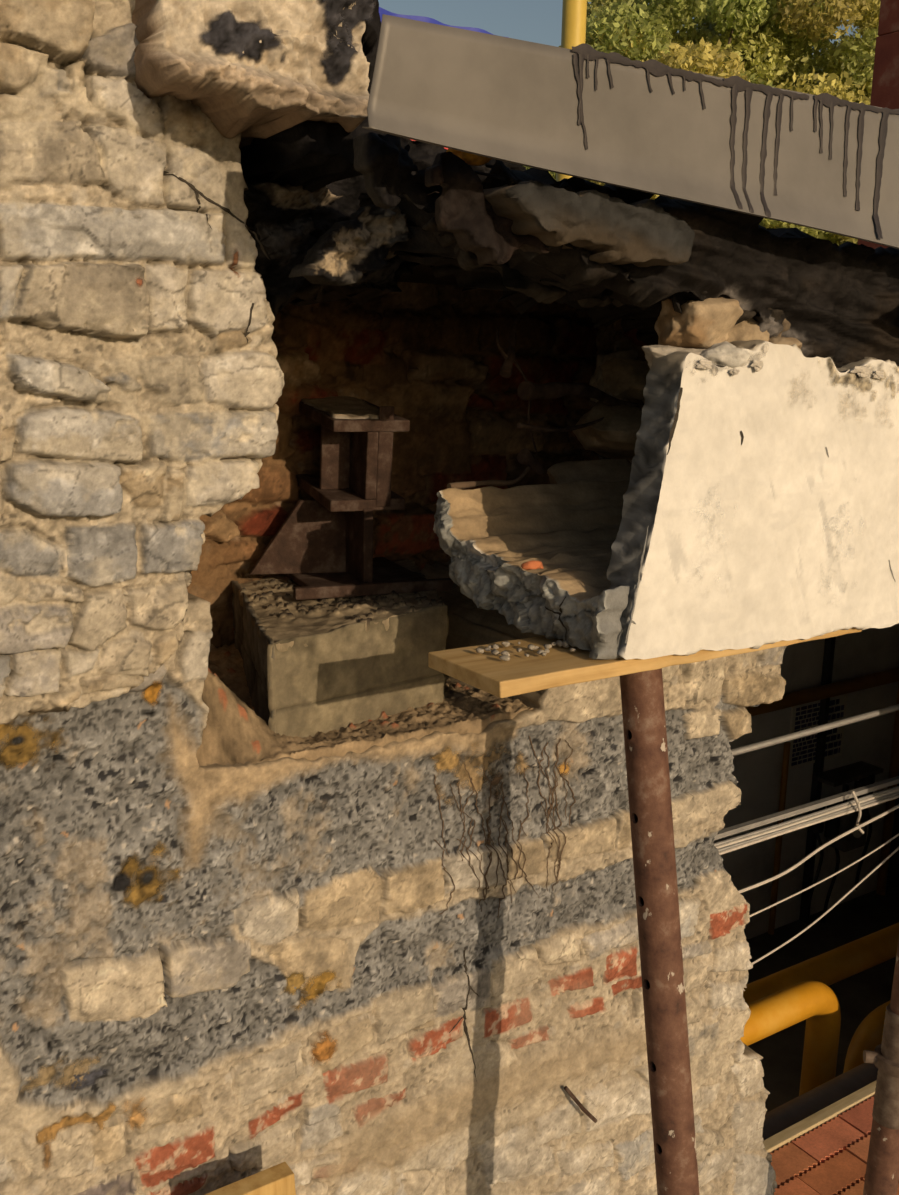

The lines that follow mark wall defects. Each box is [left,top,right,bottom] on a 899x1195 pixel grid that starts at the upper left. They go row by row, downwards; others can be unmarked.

spalling [693,344,768,376]
spalling [187,282,599,648]
crack [449,947,479,1081]